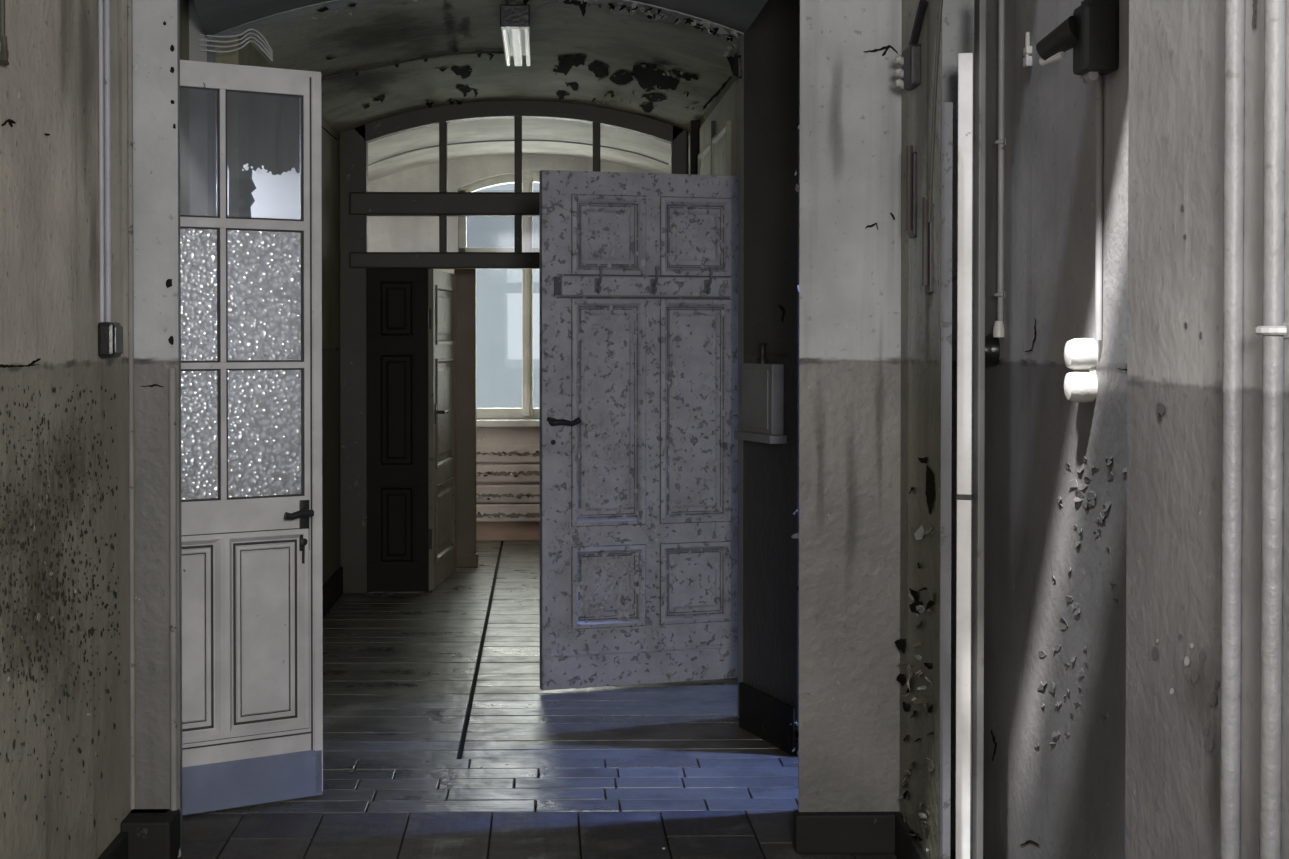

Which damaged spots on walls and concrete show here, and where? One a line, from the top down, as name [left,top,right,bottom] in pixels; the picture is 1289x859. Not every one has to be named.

spalling [563,0,742,79]
spalling [551,52,703,113]
spalling [909,457,935,540]
leakage [0,384,120,798]
flaking render [895,587,935,718]